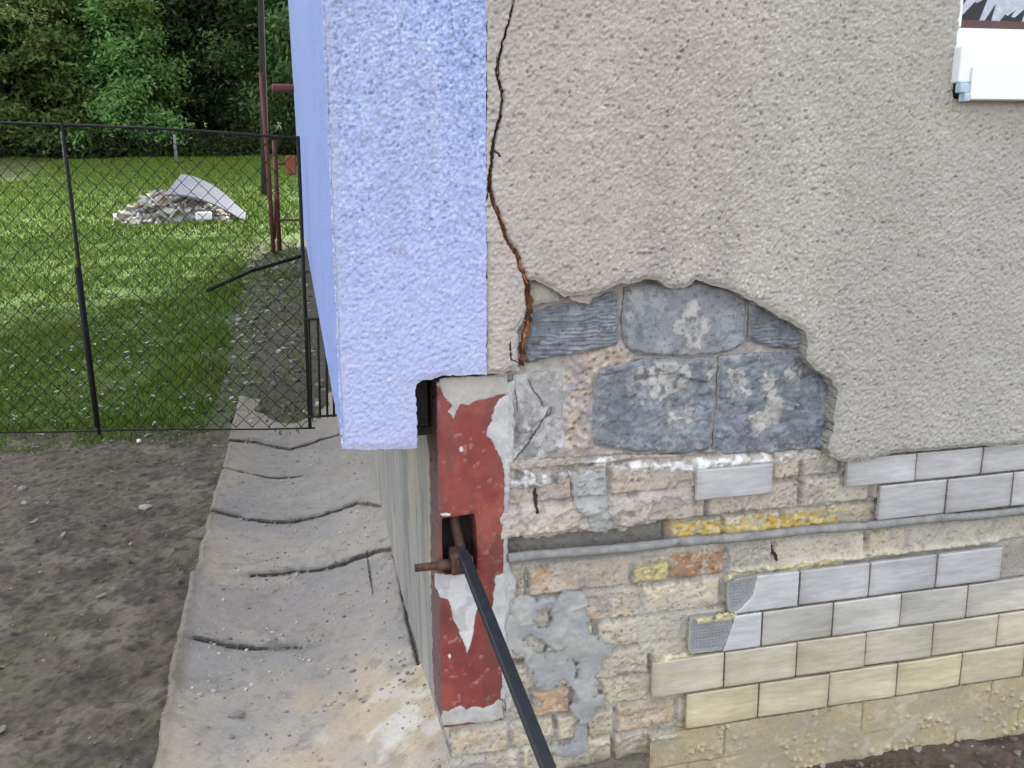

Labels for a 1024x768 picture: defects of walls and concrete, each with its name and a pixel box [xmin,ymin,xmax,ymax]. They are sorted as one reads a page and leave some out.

crack [451,5,552,460]
crack [229,434,340,450]
crack [221,467,303,479]
crack [211,502,381,524]
spalling [435,279,1024,768]
crack [250,547,391,591]
crack [191,635,303,651]